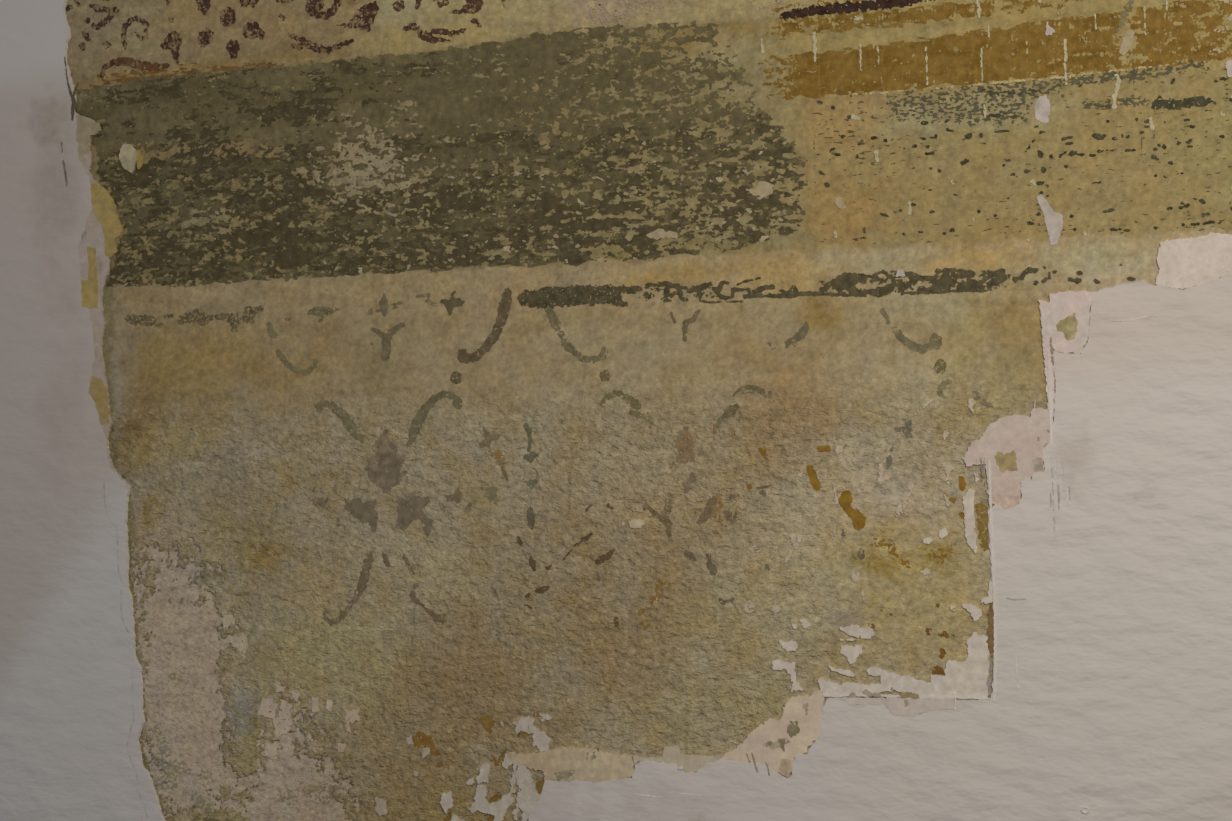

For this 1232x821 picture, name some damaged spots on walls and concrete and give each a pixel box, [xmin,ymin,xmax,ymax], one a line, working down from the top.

peeling [1155,233,1232,289]
peeling [440,290,1092,821]
peeling [406,734,430,778]